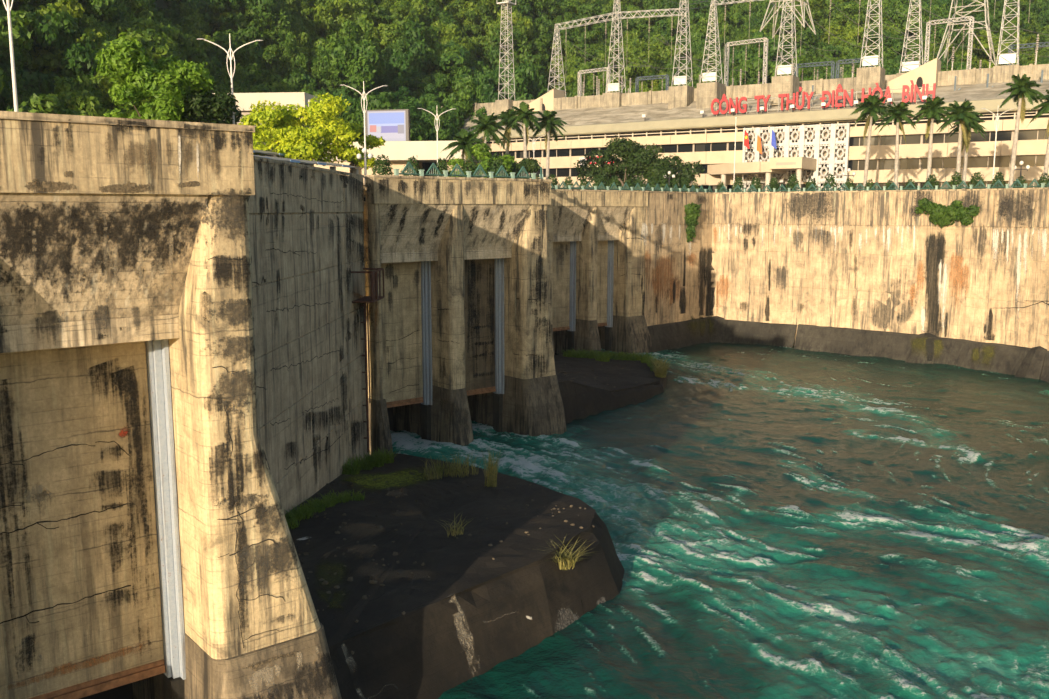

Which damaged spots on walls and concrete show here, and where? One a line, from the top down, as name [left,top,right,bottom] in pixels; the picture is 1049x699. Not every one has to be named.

water stain [107,119,253,176]
water stain [258,159,453,245]
water stain [466,181,562,378]
water stain [642,192,843,337]
water stain [859,190,948,361]
corrosion [949,254,969,305]
water stain [973,192,1047,311]
water stain [984,308,995,340]
crack [0,441,130,465]
water stain [0,188,307,632]
crack [0,503,135,534]
crack [0,585,131,624]